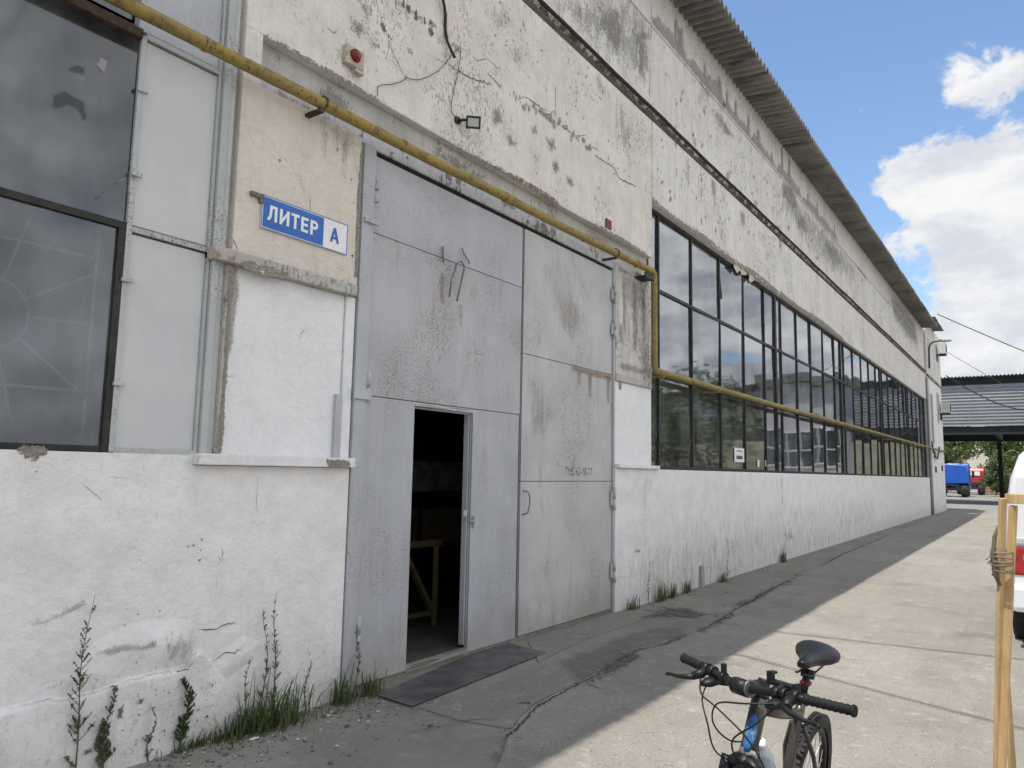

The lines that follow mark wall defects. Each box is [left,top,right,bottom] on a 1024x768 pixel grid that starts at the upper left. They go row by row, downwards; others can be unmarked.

crack [427,53,648,192]
spalling [17,443,48,472]
spalling [327,459,350,469]
crack [199,622,246,661]